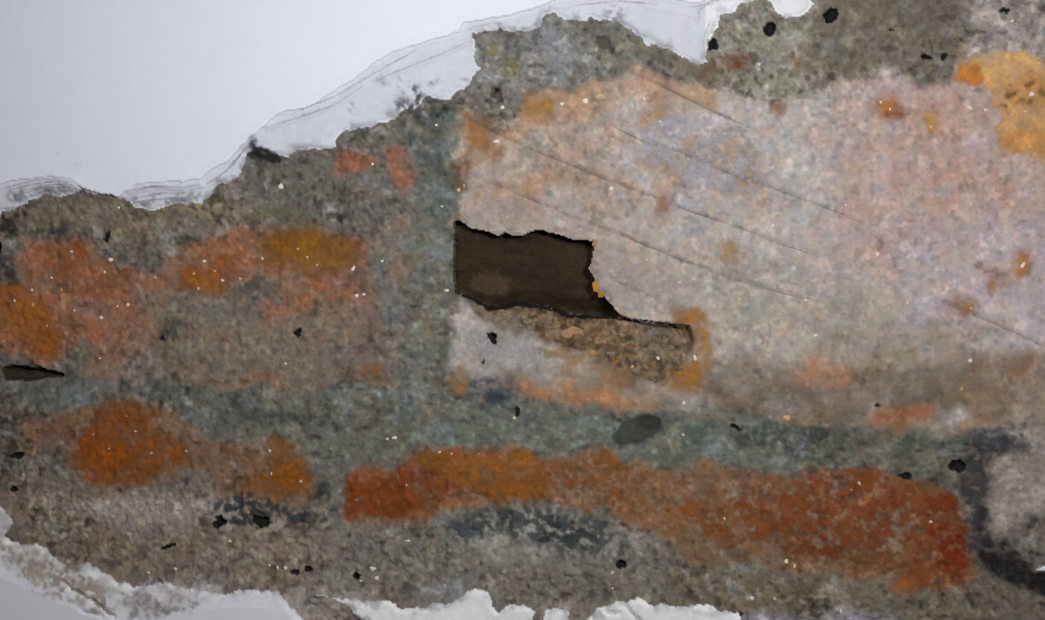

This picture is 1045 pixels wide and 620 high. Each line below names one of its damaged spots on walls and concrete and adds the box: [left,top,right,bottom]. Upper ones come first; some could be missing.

spalling [0,0,1045,286]
corrosion [954,51,1045,160]
corrosion [260,230,357,275]
spalling [456,214,696,390]
corrosion [674,309,712,387]
corrosion [77,402,186,484]
corrosion [346,449,651,519]
spalling [0,343,1045,620]
corrosion [682,469,967,590]